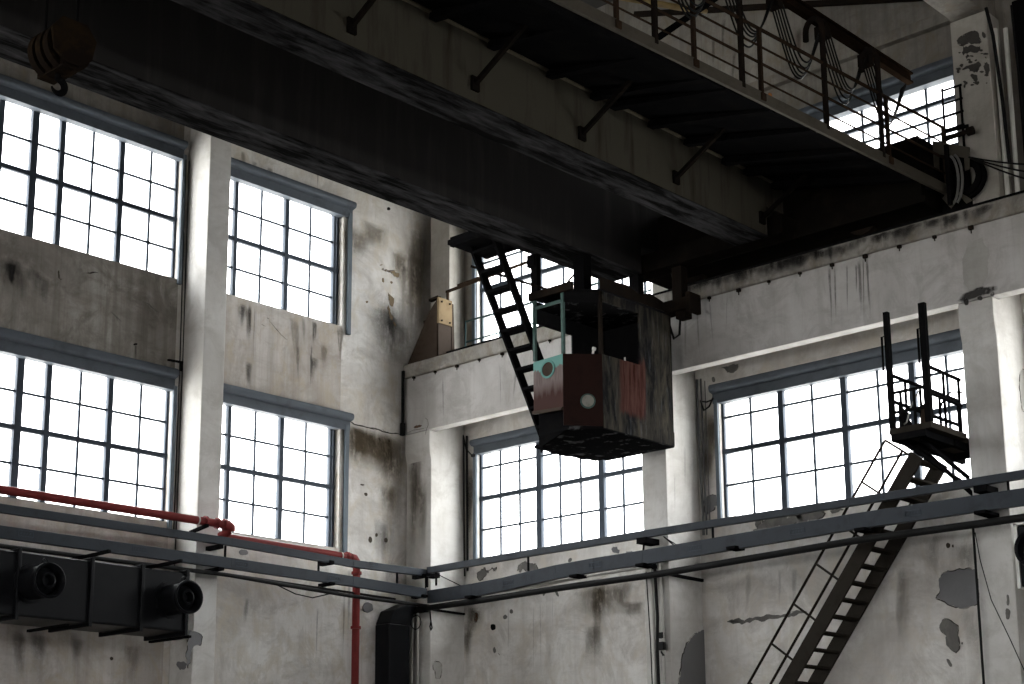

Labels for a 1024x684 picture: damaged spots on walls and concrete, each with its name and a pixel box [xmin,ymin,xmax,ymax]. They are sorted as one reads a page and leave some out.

peeling [956,30,990,88]
peeling [380,264,399,326]
spalling [935,567,980,667]
spalling [176,630,203,670]
spalling [678,630,706,684]